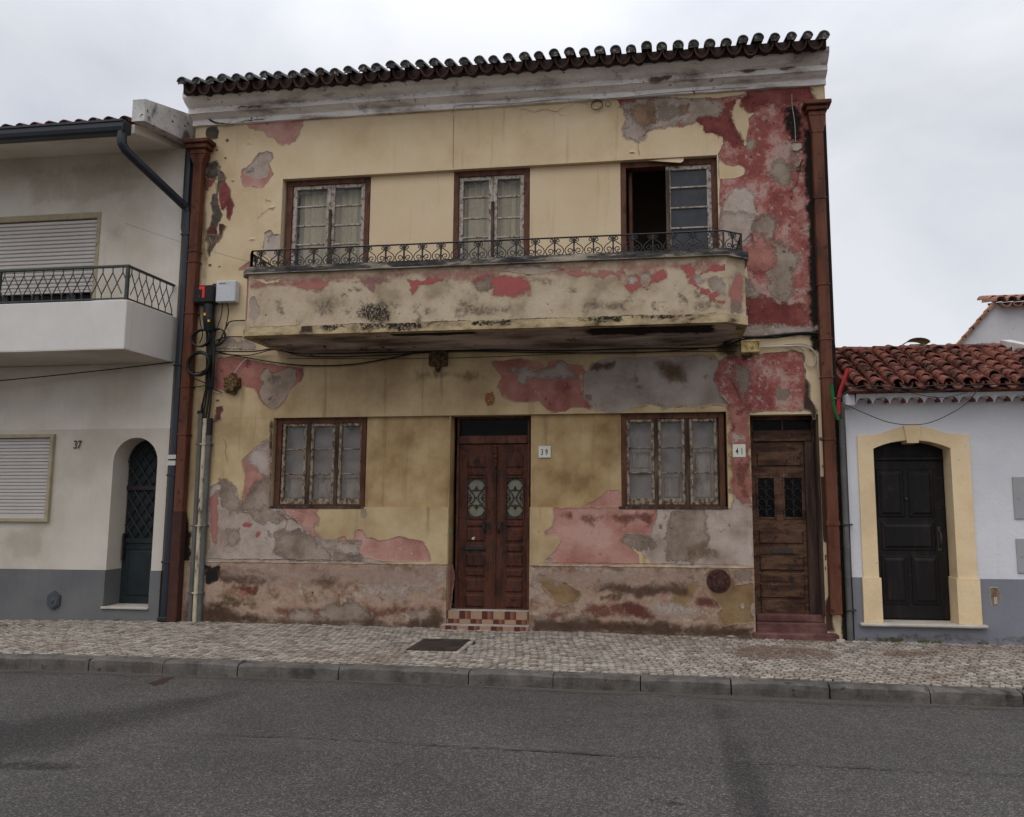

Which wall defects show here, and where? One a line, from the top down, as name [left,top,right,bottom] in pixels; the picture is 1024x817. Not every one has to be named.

peeling [205,121,304,267]
peeling [358,86,825,337]
water stain [358,304,511,336]
peeling [213,338,305,424]
spalling [205,438,431,563]
spalling [490,350,818,632]
water stain [202,603,267,622]
water stain [205,565,334,596]
water stain [346,567,444,628]
water stain [533,567,753,636]